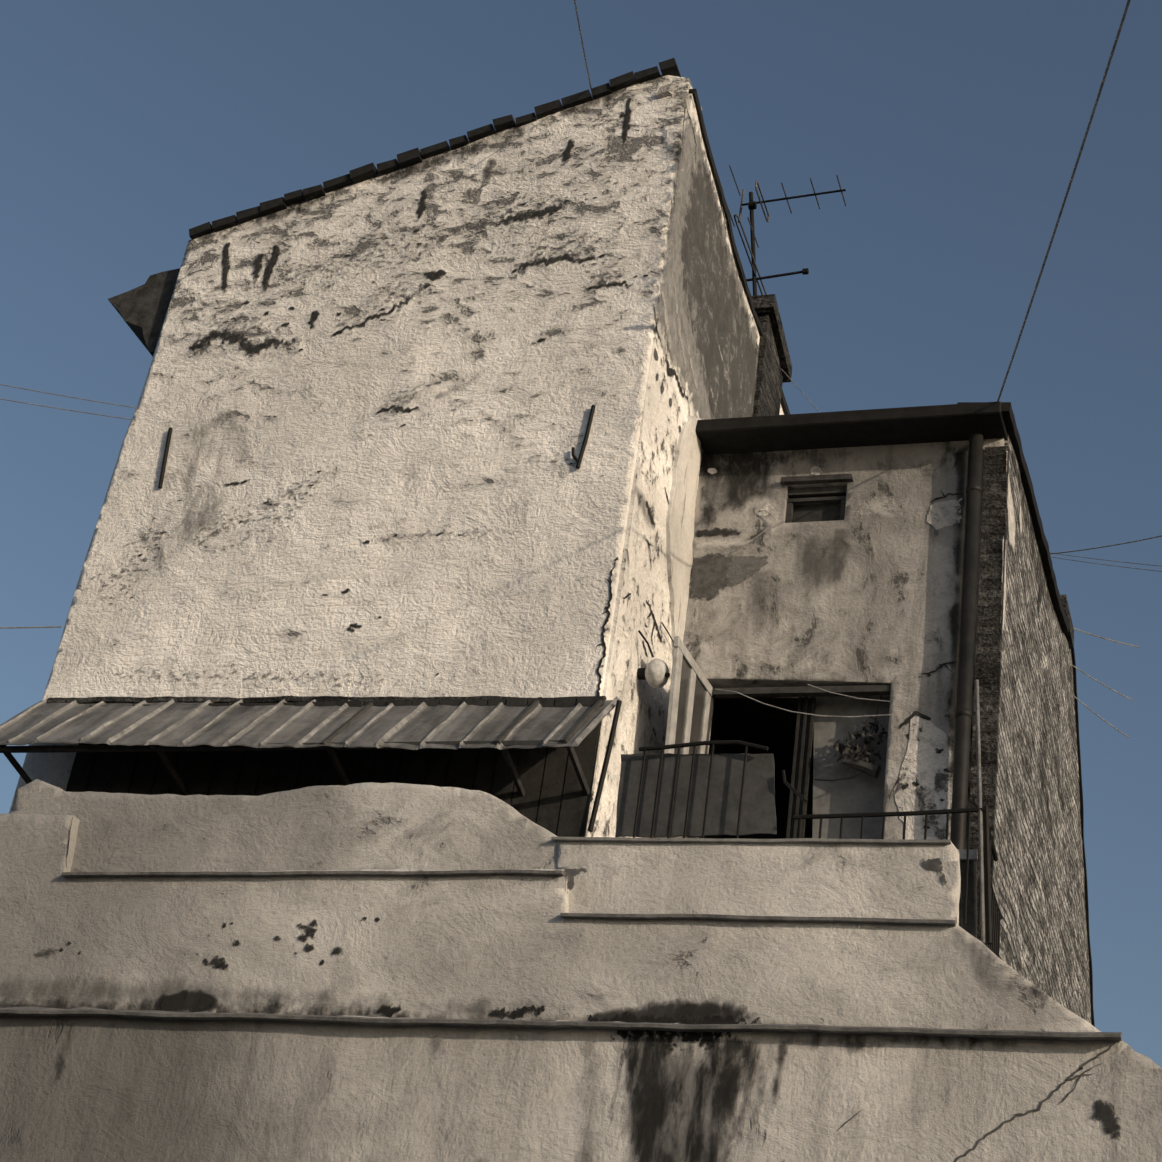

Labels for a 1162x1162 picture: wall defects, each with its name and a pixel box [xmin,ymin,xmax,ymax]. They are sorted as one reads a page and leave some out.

peeling [188,118,759,427]
spalling [926,498,963,530]
crack [596,557,662,696]
spalling [895,712,953,840]
spalling [202,955,228,970]
damp [255,994,343,1016]
spalling [294,919,342,965]
damp [588,1001,762,1162]
crack [954,1043,1115,1162]